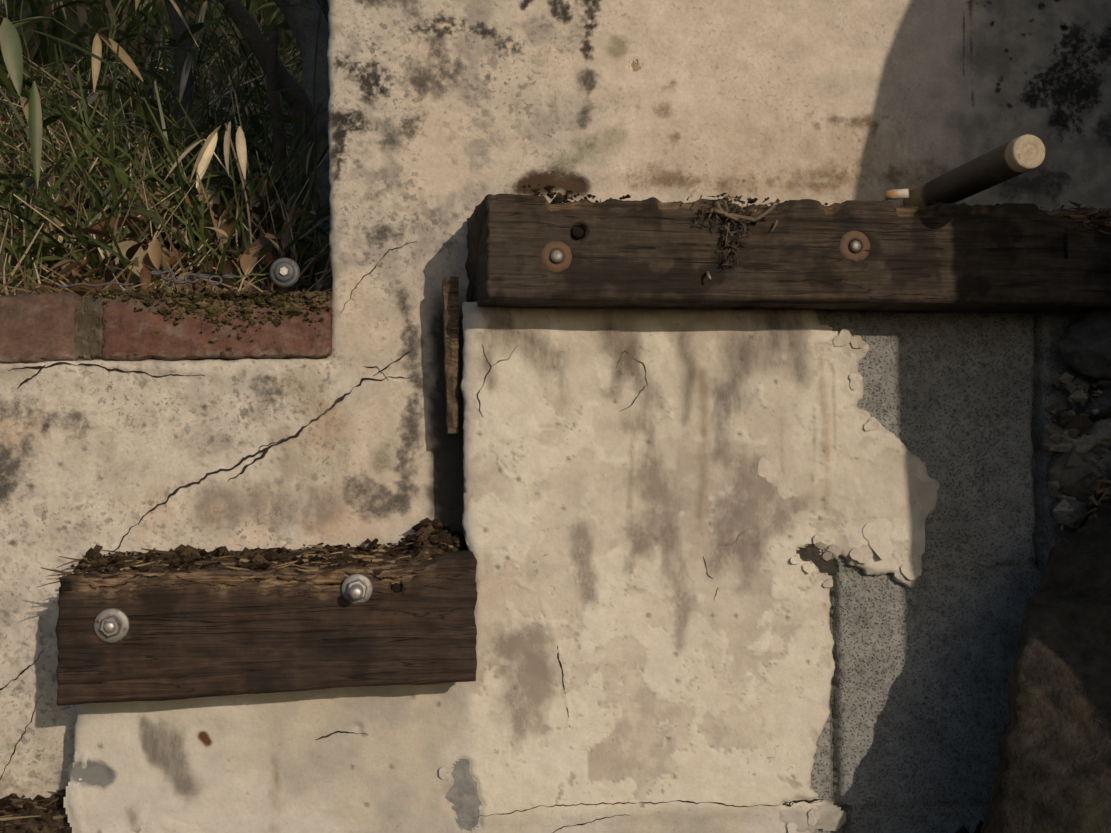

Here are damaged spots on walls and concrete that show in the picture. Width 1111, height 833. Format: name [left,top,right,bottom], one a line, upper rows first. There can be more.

mould [329,56,393,179]
mould [404,2,519,93]
mould [549,0,600,91]
mould [1008,24,1111,138]
crack [8,362,204,389]
peeling [813,325,865,399]
crack [111,352,409,554]
peeling [790,480,925,588]
crack [0,648,45,690]
crack [0,695,42,780]
peeling [439,757,483,833]
crack [462,799,824,833]